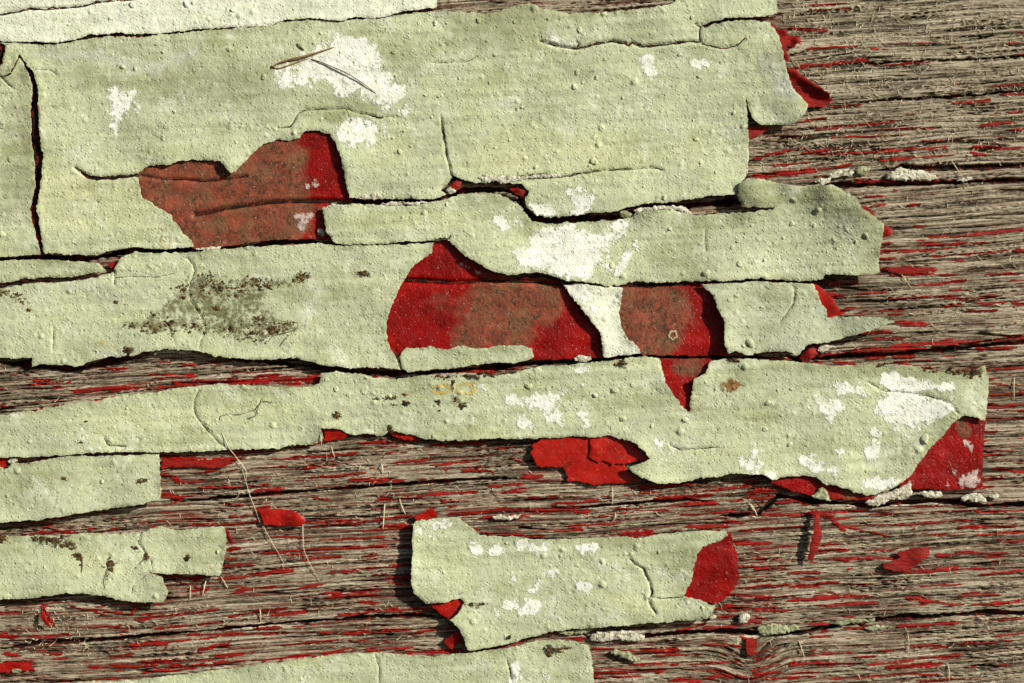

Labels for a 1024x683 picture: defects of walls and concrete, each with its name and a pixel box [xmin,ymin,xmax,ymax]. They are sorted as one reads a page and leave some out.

crack [0,8,451,349]
crack [195,120,741,252]
peeling [0,0,989,523]
peeling [0,526,227,603]
peeling [68,508,728,683]
peeling [808,510,822,562]
peeling [883,546,929,572]
peeling [0,661,30,673]
peeling [745,638,755,655]